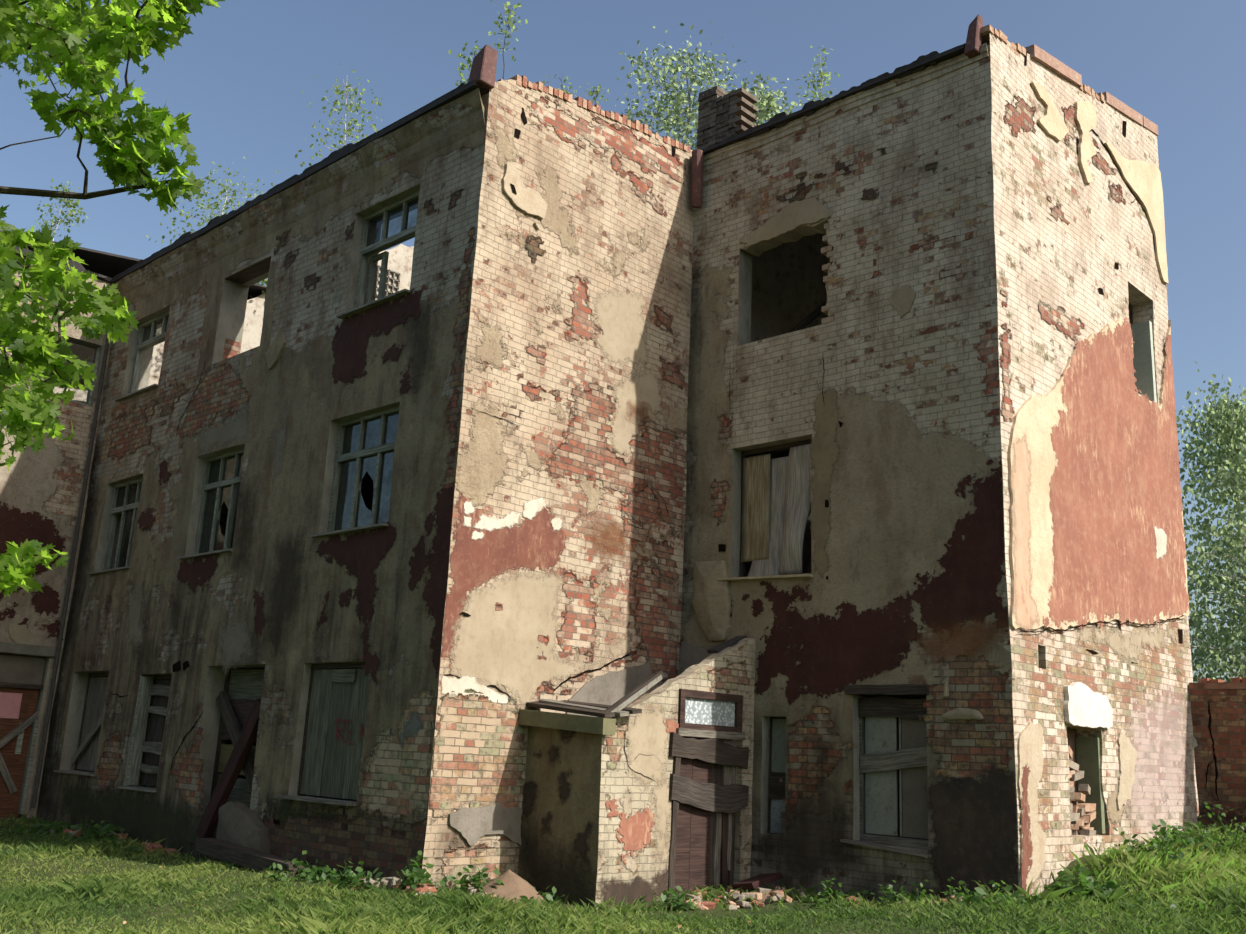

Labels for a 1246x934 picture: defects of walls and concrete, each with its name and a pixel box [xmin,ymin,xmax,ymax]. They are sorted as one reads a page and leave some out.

flaking render [501,162,548,263]
flaking render [514,93,684,216]
flaking render [107,362,252,485]
peeling [0,501,66,641]
flaking render [261,226,687,909]
crack [443,674,514,705]
crack [544,647,647,694]
peeling [707,299,1190,836]
crack [1015,615,1184,636]
crack [1206,700,1219,800]
water stain [521,831,595,908]
water stain [928,769,1018,898]